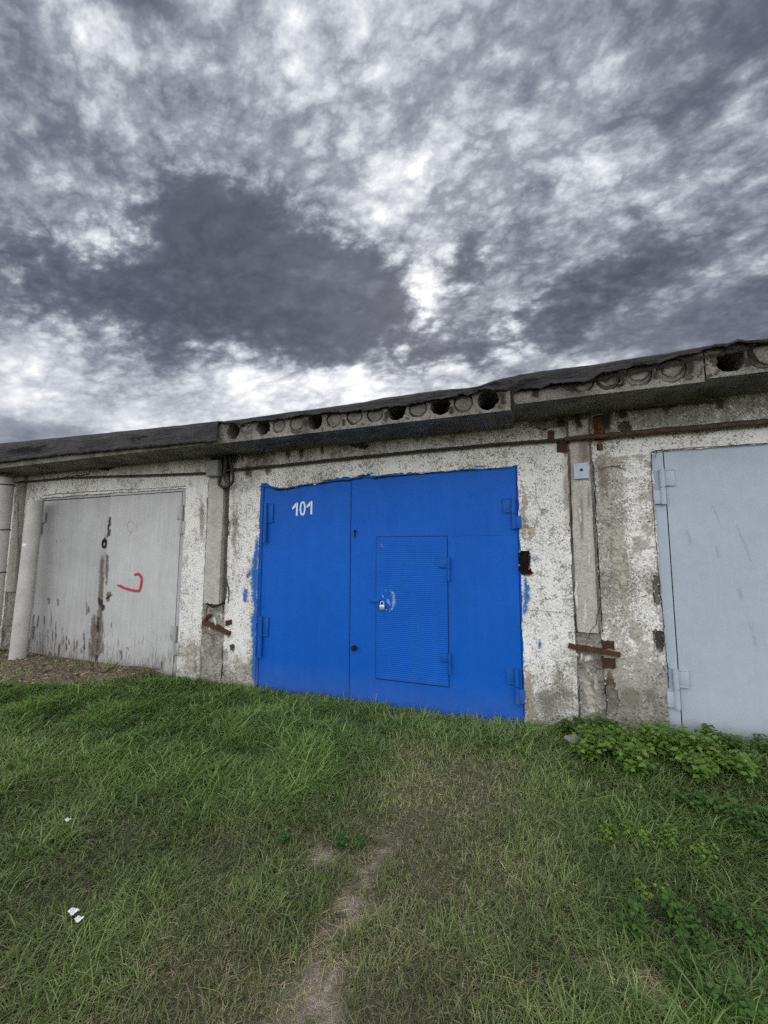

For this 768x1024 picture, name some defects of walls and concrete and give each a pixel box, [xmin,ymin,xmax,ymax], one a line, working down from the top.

spalling [518,550,533,576]
spalling [651,576,659,605]
rust [88,555,110,658]